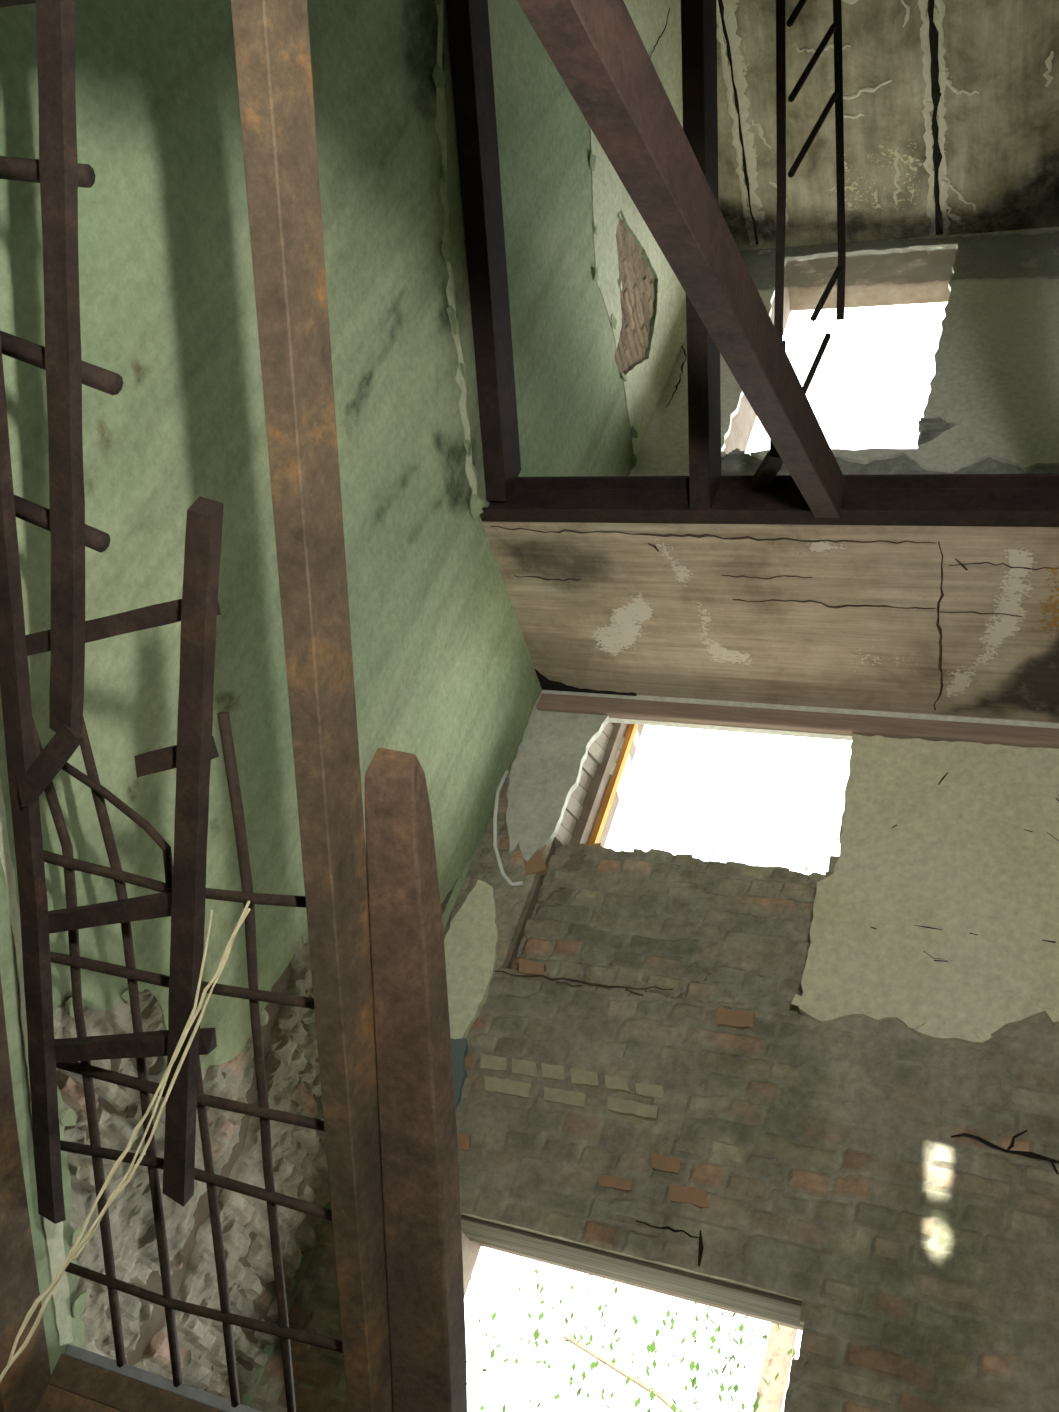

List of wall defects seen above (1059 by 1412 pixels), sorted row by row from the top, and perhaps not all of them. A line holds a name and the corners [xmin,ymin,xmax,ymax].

peeling [623,0,683,128]
water stain [740,90,1059,289]
crack [841,0,980,236]
water stain [919,2,943,67]
peeling [589,128,687,467]
water stain [591,593,654,657]
crack [491,526,1058,710]
water stain [941,547,1059,718]
flaking render [791,994,808,1007]
flaking render [53,934,330,1405]
crack [636,1221,704,1266]
crack [951,1130,1059,1175]